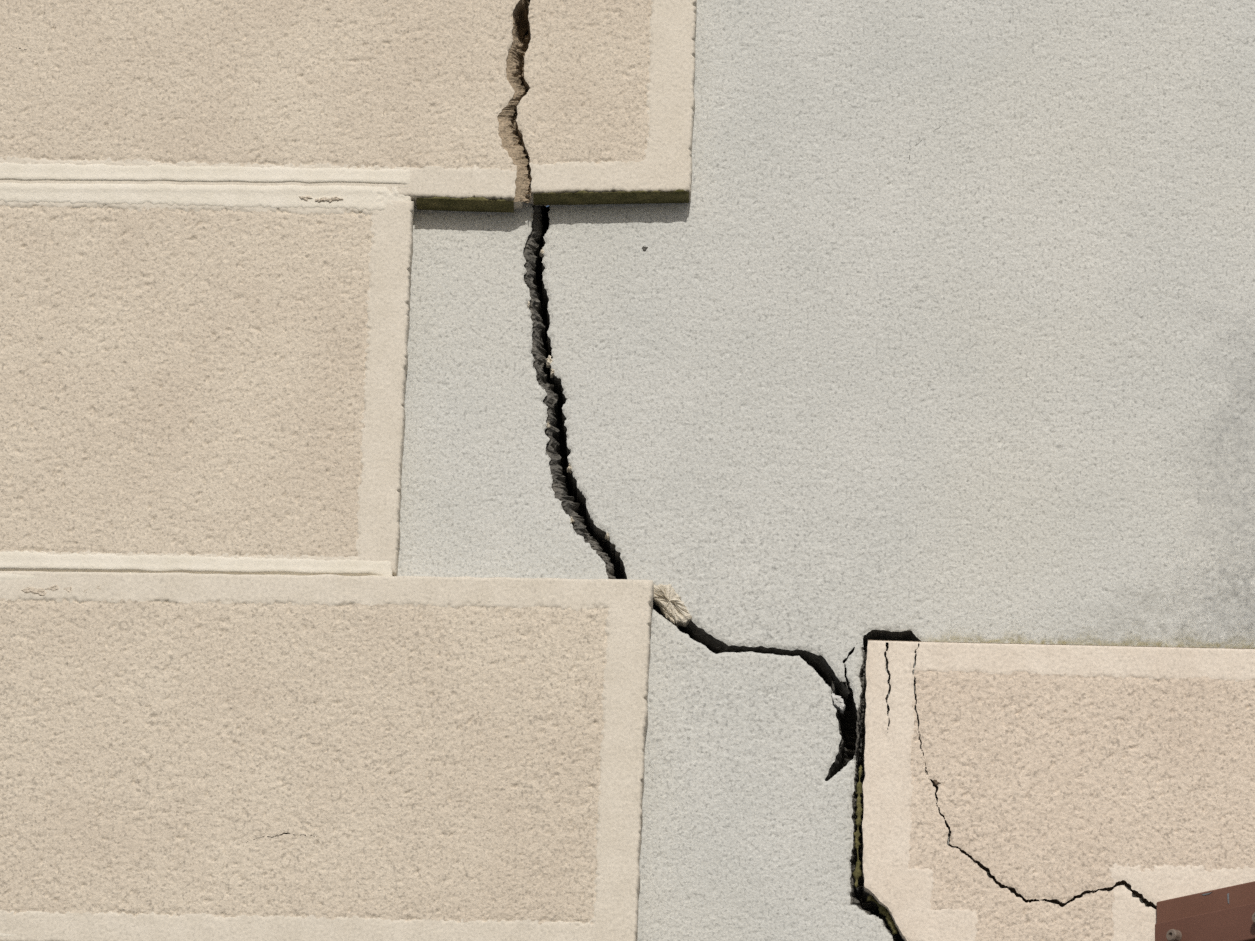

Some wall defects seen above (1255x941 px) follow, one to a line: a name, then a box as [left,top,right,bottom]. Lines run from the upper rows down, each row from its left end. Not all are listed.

crack [497,0,1157,941]